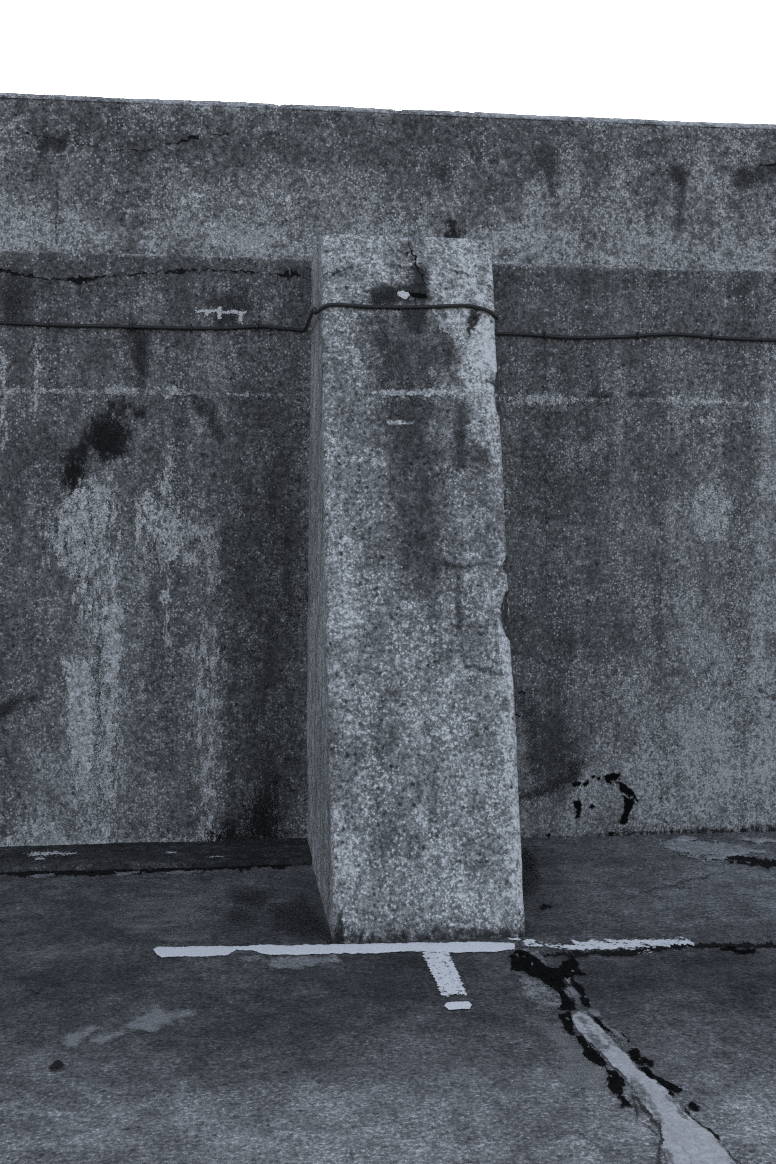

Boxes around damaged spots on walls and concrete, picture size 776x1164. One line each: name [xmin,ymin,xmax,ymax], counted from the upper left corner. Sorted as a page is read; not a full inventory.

crack [0,267,301,284]
water stain [0,328,288,847]
crack [724,855,776,869]
crack [541,941,776,958]
crack [631,1094,741,1164]